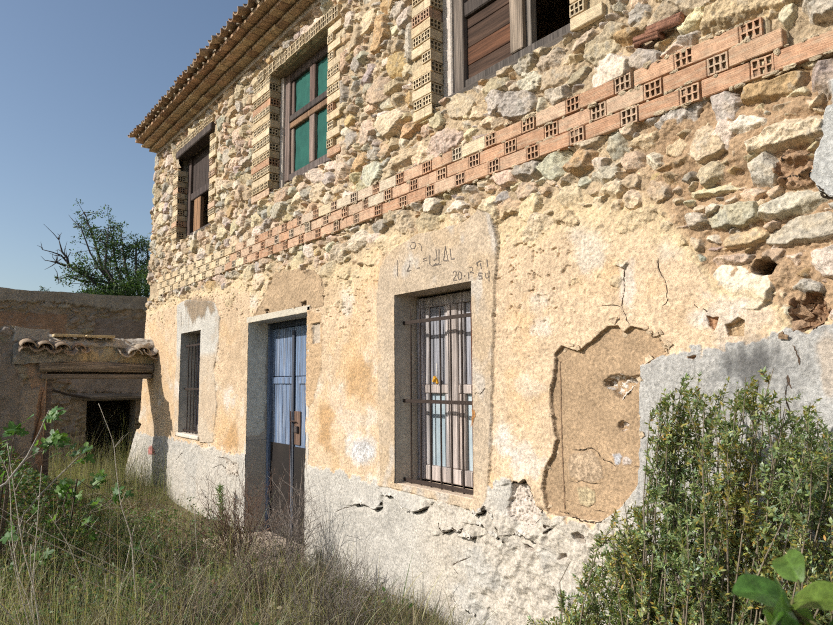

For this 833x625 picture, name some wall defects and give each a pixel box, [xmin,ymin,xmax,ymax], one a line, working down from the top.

spalling [707,316,745,336]
spalling [778,291,831,339]
peeling [506,317,673,525]